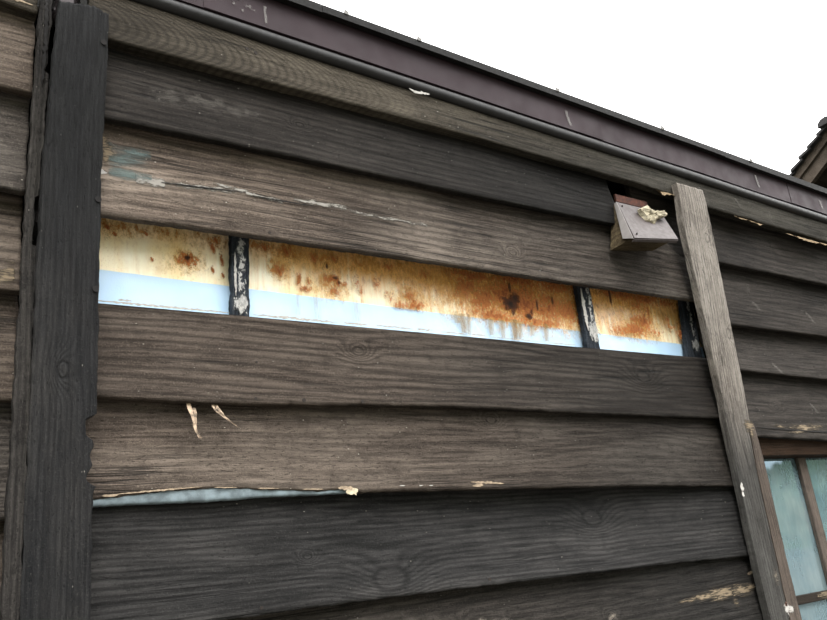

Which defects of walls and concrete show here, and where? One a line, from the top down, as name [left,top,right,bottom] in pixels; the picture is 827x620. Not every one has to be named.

corrosion [176,251,199,268]
corrosion [194,231,226,279]
corrosion [249,239,579,341]
corrosion [595,289,682,339]